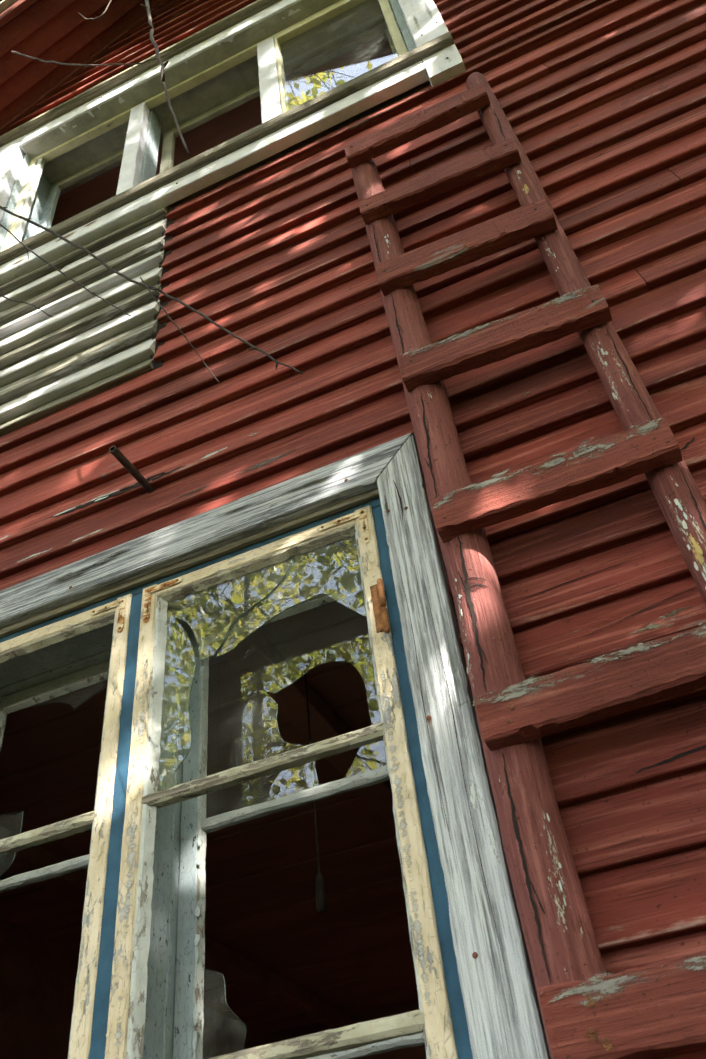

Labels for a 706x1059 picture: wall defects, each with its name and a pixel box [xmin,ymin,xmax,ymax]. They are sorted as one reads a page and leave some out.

peeling [669,499,706,589]
peeling [374,617,444,1031]
crack [502,753,551,985]
peeling [541,811,569,933]